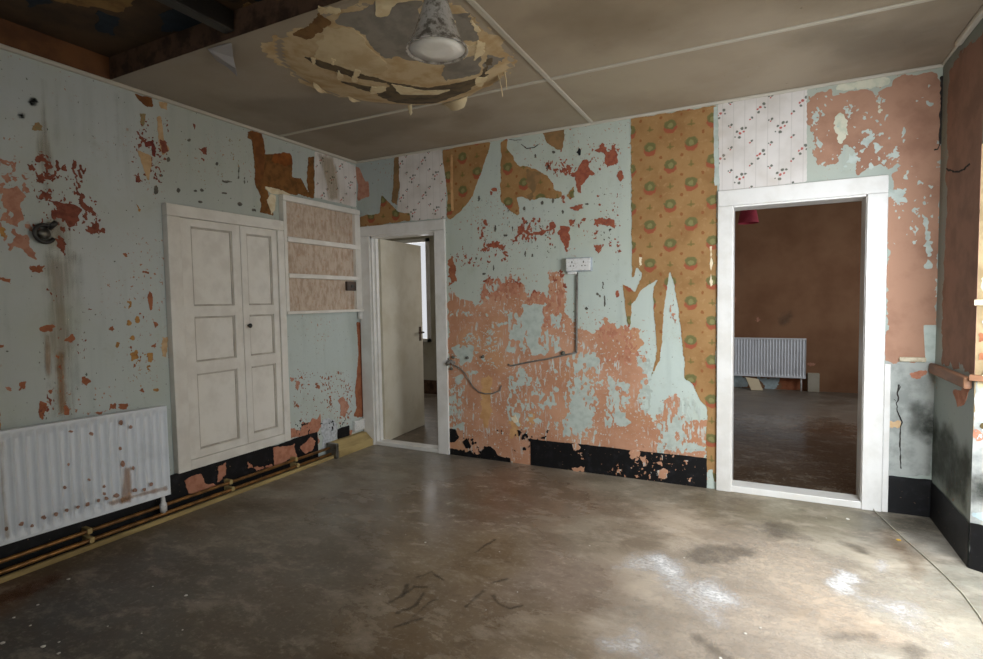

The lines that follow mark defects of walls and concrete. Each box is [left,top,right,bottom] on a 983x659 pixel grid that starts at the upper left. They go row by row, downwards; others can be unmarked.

peeling [26,0,133,36]
peeling [131,94,170,194]
peeling [0,151,105,273]
peeling [38,355,81,420]
peeling [39,324,87,359]
peeling [116,292,168,392]
peeling [446,130,707,482]
peeling [806,33,983,525]
crack [894,384,903,469]
water stain [885,361,983,501]